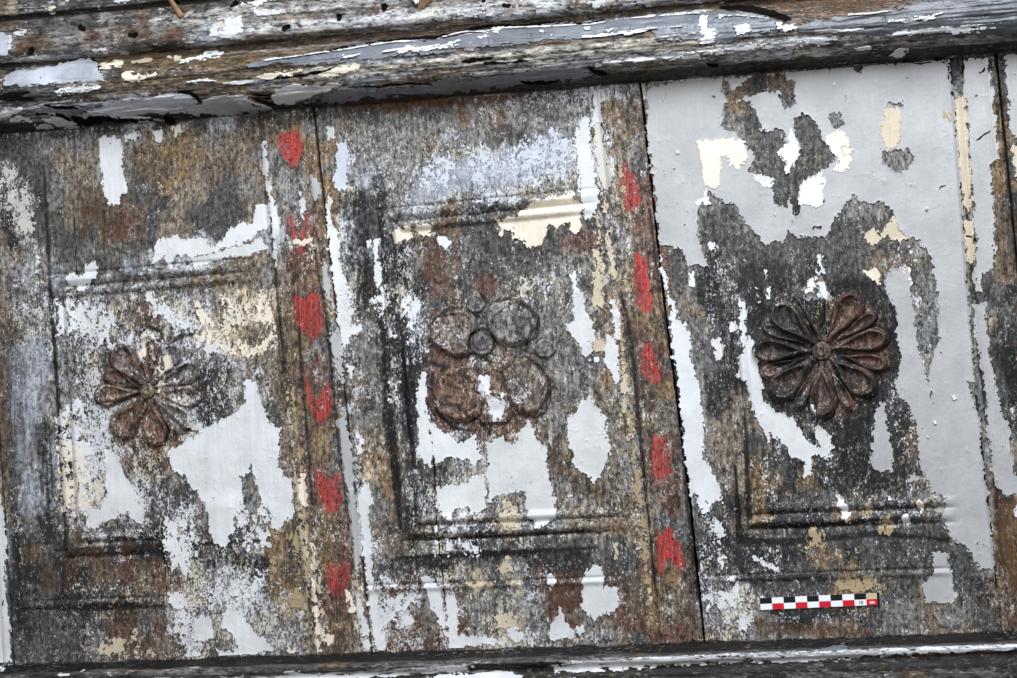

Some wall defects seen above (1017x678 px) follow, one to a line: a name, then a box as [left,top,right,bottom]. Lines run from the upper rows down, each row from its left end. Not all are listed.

peeling [54,396,146,531]
peeling [50,261,278,400]
peeling [152,141,313,270]
peeling [146,379,334,658]
peeling [299,126,452,384]
peeling [335,409,525,651]
peeling [0,0,1017,207]
peeling [412,91,655,641]
crack [720,4,792,21]
peeling [645,48,1017,636]
peeling [257,664,523,678]
peeling [551,643,1017,678]